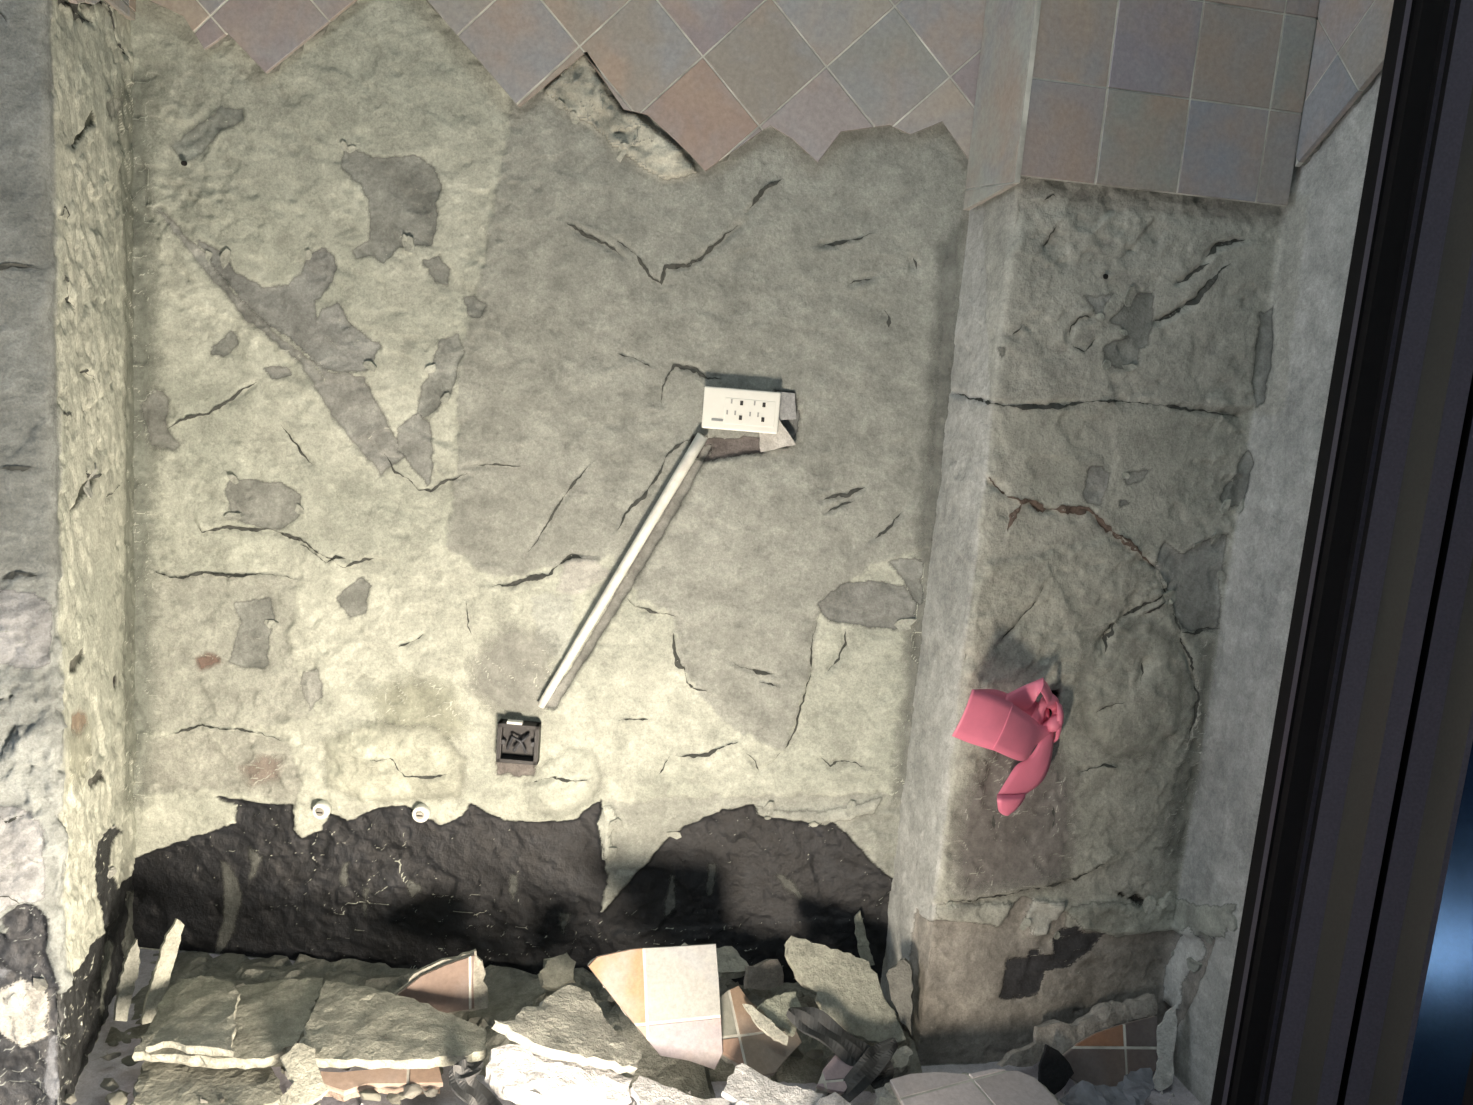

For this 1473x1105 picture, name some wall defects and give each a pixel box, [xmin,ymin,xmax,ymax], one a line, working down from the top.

spalling [545,54,697,180]
flaking render [340,140,450,285]
crack [567,179,782,285]
flaking render [198,240,381,372]
crack [959,394,1236,417]
crack [156,524,375,579]
crack [466,461,595,633]
crack [989,477,1219,742]
crack [659,624,847,774]
peeling [597,806,624,861]
peeling [0,977,49,1048]
flaking render [902,890,1238,1065]